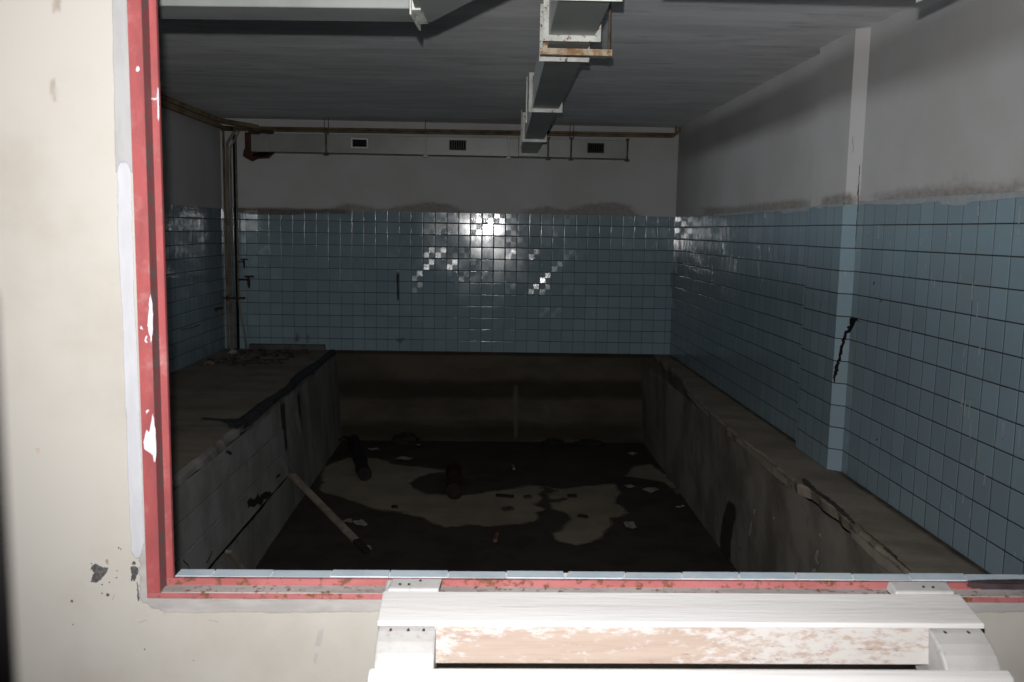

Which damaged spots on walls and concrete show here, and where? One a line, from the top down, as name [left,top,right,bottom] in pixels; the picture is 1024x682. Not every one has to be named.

peeling [140,295,153,343]
crack [833,318,860,383]
peeling [143,410,156,462]
spalling [90,559,138,597]